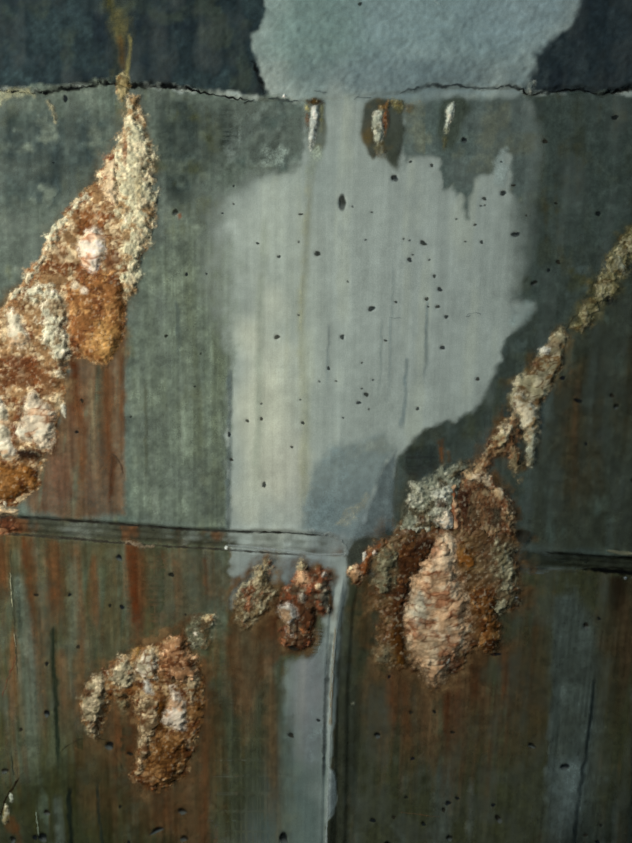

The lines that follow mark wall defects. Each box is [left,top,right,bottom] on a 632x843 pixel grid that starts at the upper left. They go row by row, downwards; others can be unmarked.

crack [4,62,297,103]
crack [410,83,630,95]
rust [29,337,127,517]
water stain [0,0,336,843]
water stain [327,0,632,843]